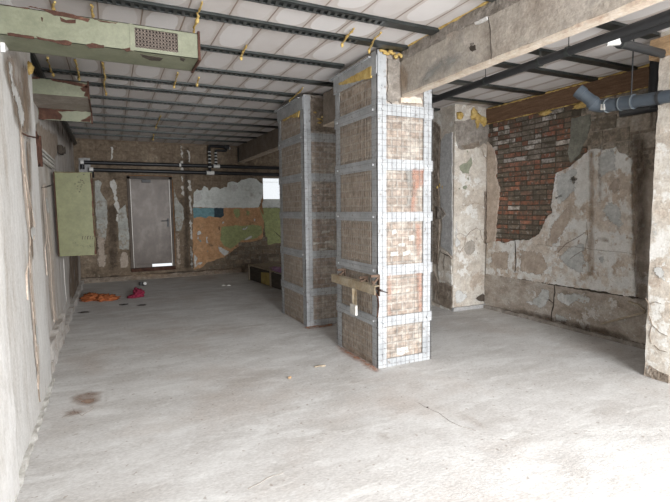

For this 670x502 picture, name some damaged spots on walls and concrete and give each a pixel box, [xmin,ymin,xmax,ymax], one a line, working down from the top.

peeling [9,61,25,128]
peeling [95,180,108,268]
peeling [118,205,129,268]
peeling [192,178,281,270]
peeling [454,105,639,308]
crack [515,244,666,352]